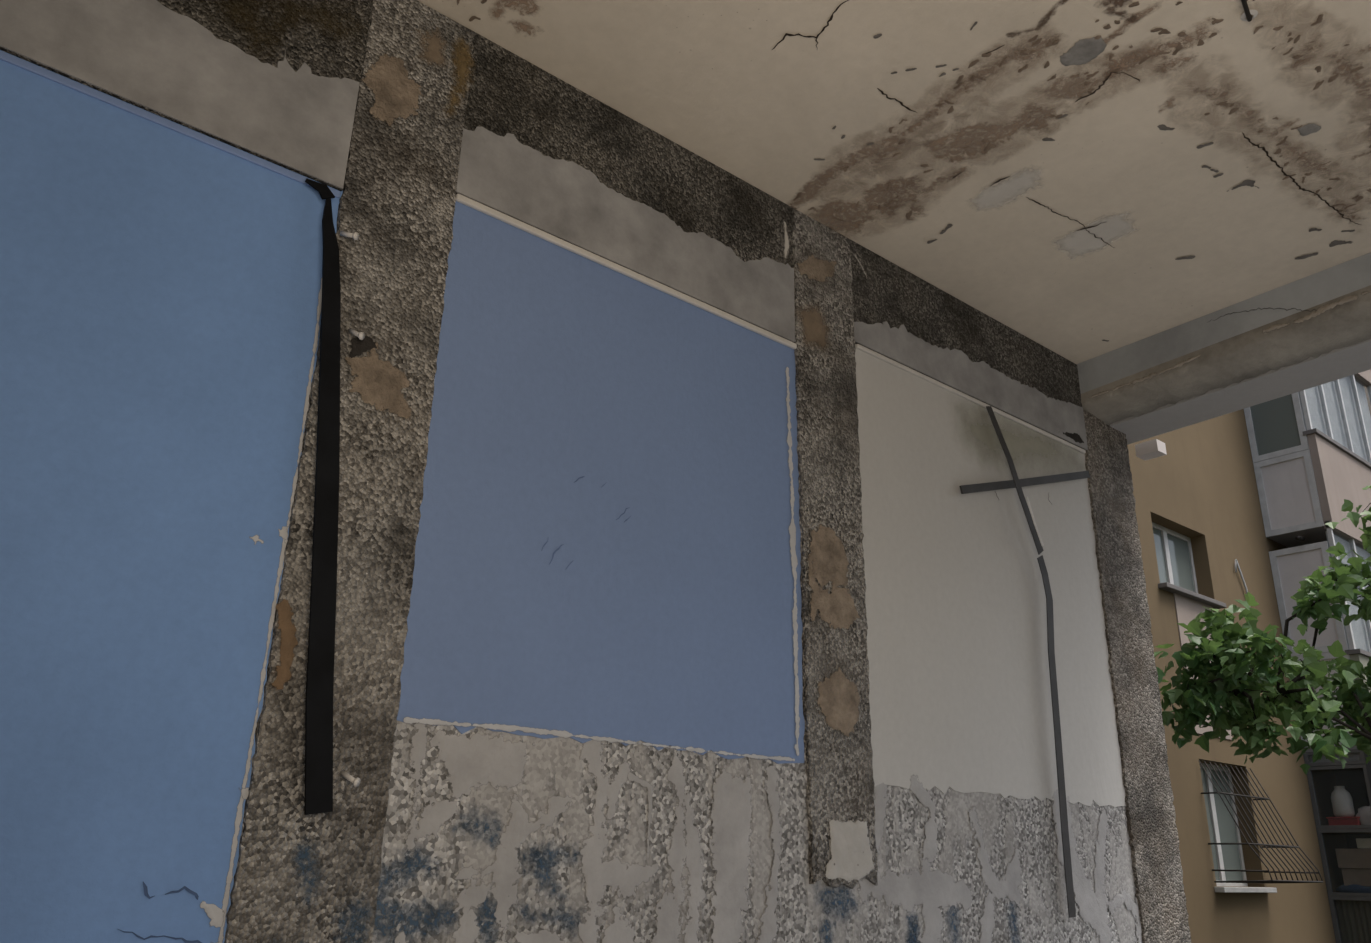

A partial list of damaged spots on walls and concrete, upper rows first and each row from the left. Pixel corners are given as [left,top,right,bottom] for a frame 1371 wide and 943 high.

crack [772,0,848,50]
damp [1254,14,1371,99]
damp [791,0,1223,232]
spalling [1197,142,1258,190]
damp [1194,86,1371,219]
crack [1242,132,1360,225]
spalling [1295,228,1355,260]
spalling [403,367,860,761]
crack [143,882,199,900]
crack [118,929,202,943]